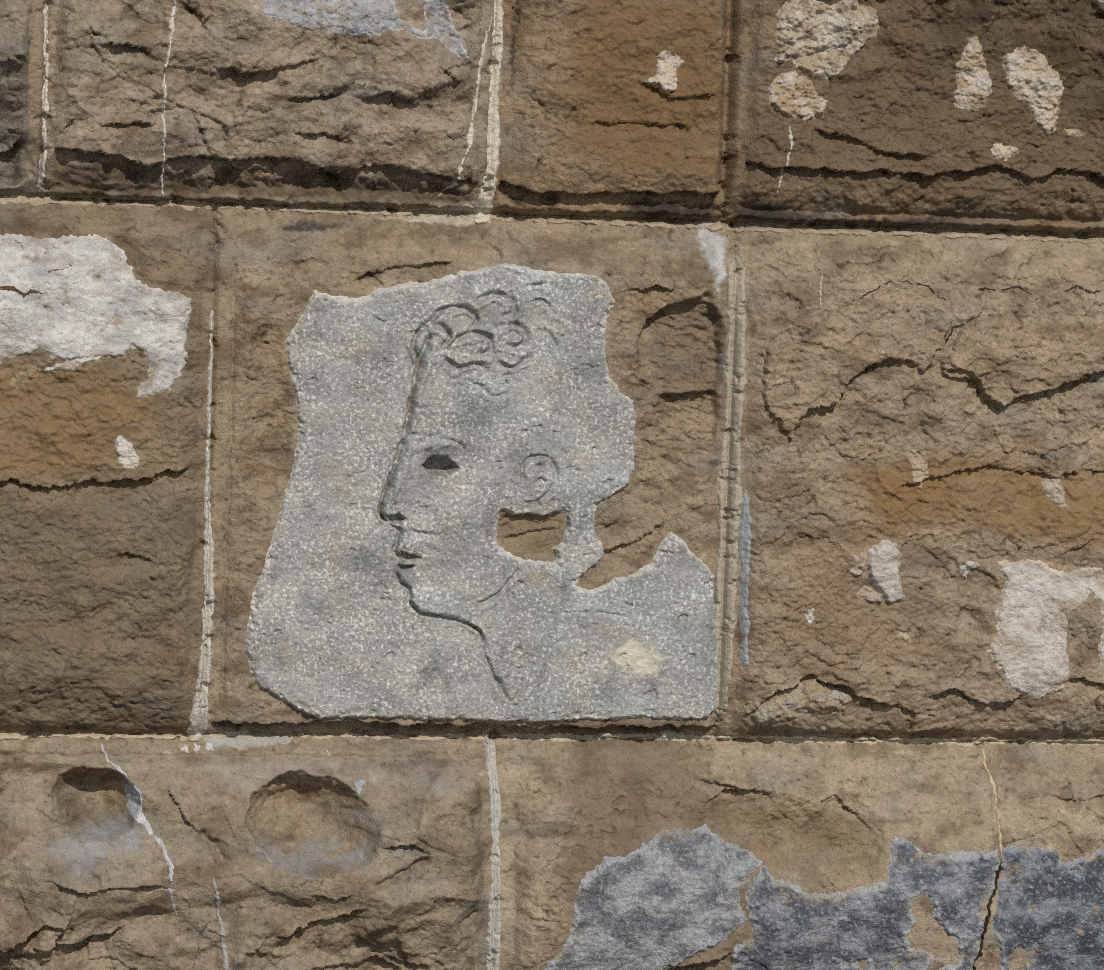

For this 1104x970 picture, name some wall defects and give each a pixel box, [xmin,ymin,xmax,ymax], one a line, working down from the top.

crack [160,0,177,199]
spalling [835,0,1104,168]
peeling [4,356,101,389]
crack [101,743,179,919]
spalling [710,791,884,885]
crack [973,745,1003,970]